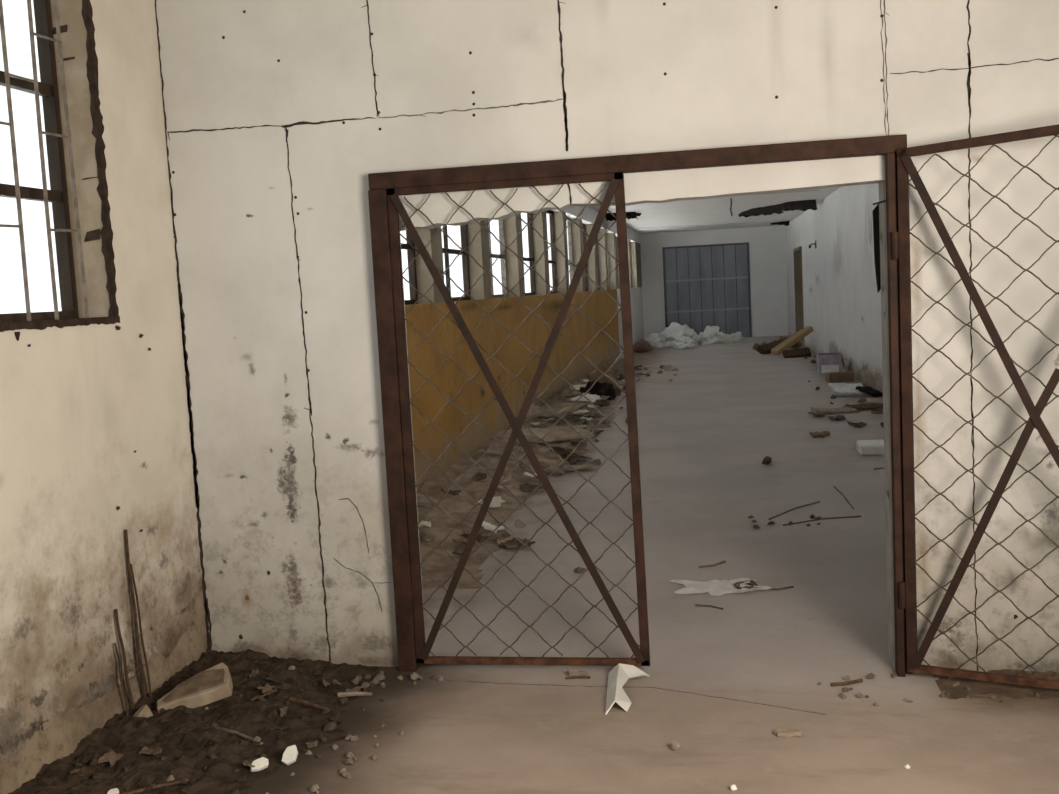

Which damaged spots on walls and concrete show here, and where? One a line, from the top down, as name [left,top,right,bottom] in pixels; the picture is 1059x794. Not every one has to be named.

leakage [279,447,297,518]
leakage [0,690,47,754]